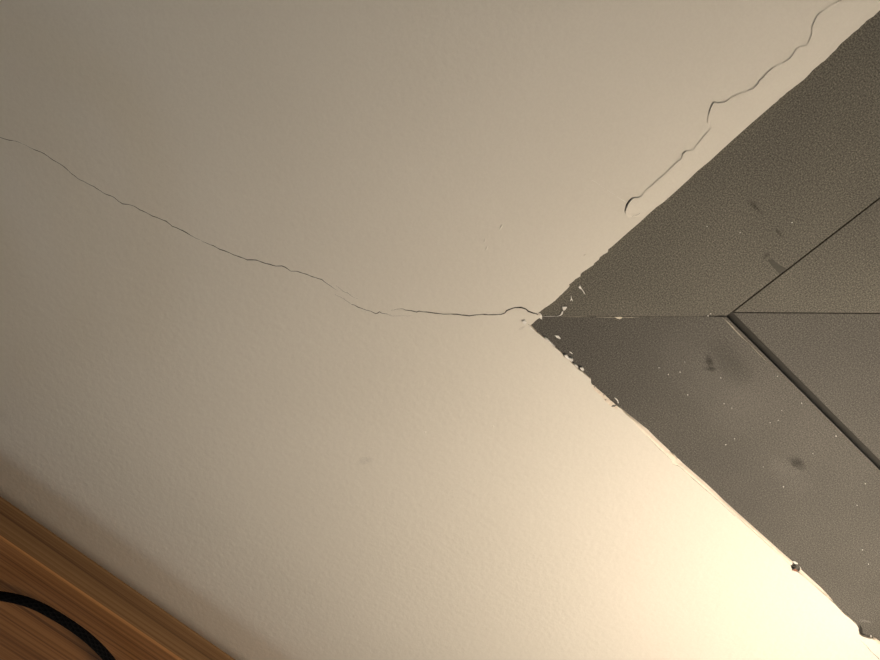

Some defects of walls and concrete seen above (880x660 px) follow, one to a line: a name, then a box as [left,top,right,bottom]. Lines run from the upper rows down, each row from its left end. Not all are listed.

peeling [625,0,880,217]
crack [0,137,538,316]
spalling [592,385,619,409]